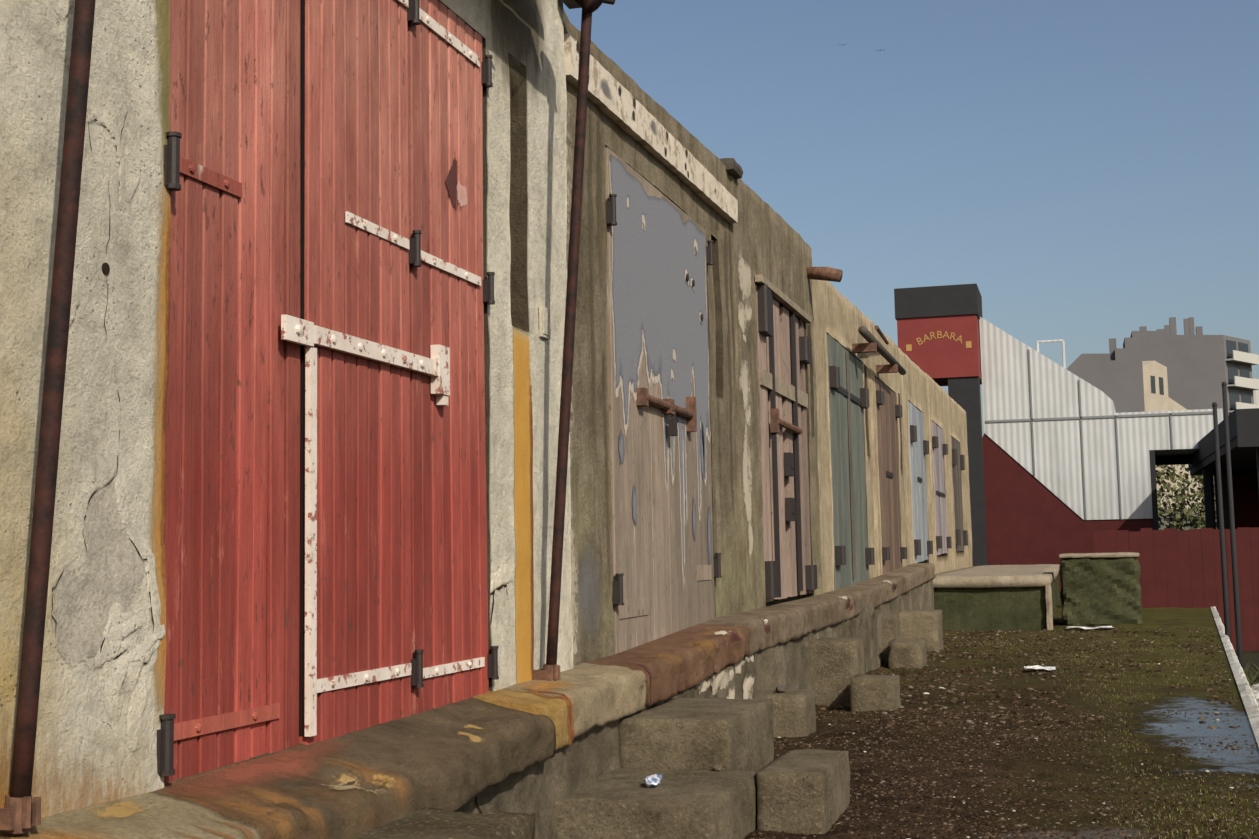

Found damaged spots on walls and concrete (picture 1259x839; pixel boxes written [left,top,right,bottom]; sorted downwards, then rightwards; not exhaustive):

crack [57,19,128,210]
peeling [609,155,711,584]
corrosion [151,187,171,708]
spalling [42,362,166,753]
spalling [714,631,741,642]
spalling [697,654,754,699]
corrosion [2,772,146,839]
corrosion [186,787,323,839]
peeling [321,774,395,793]